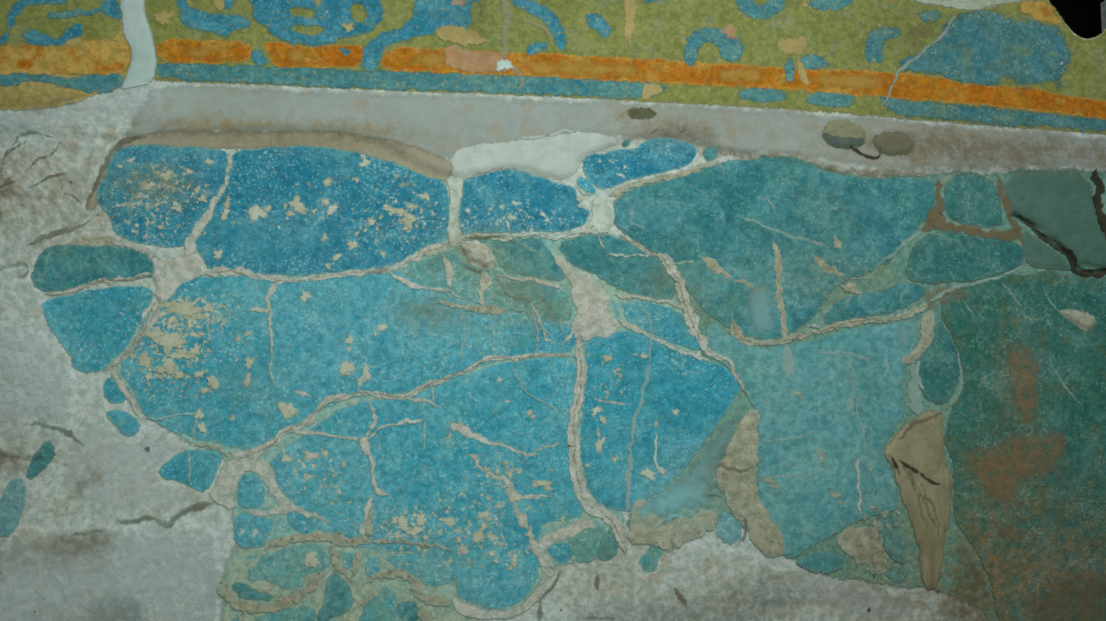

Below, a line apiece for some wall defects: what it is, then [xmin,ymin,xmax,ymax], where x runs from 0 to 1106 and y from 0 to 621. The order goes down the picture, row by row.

peeling [116,299,226,413]
spalling [67,129,453,230]
peeling [164,201,755,621]
crack [0,136,1106,621]
crack [881,15,956,107]
peeling [753,157,1106,621]